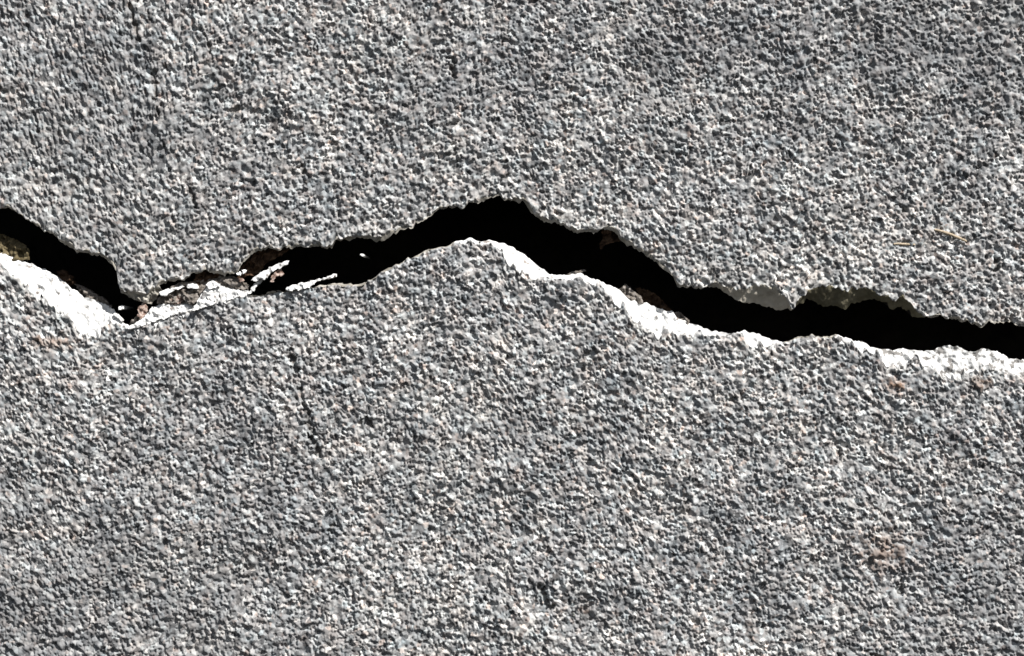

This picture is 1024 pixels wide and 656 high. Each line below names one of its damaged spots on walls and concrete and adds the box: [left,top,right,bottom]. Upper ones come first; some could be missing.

crack [0,193,1024,360]